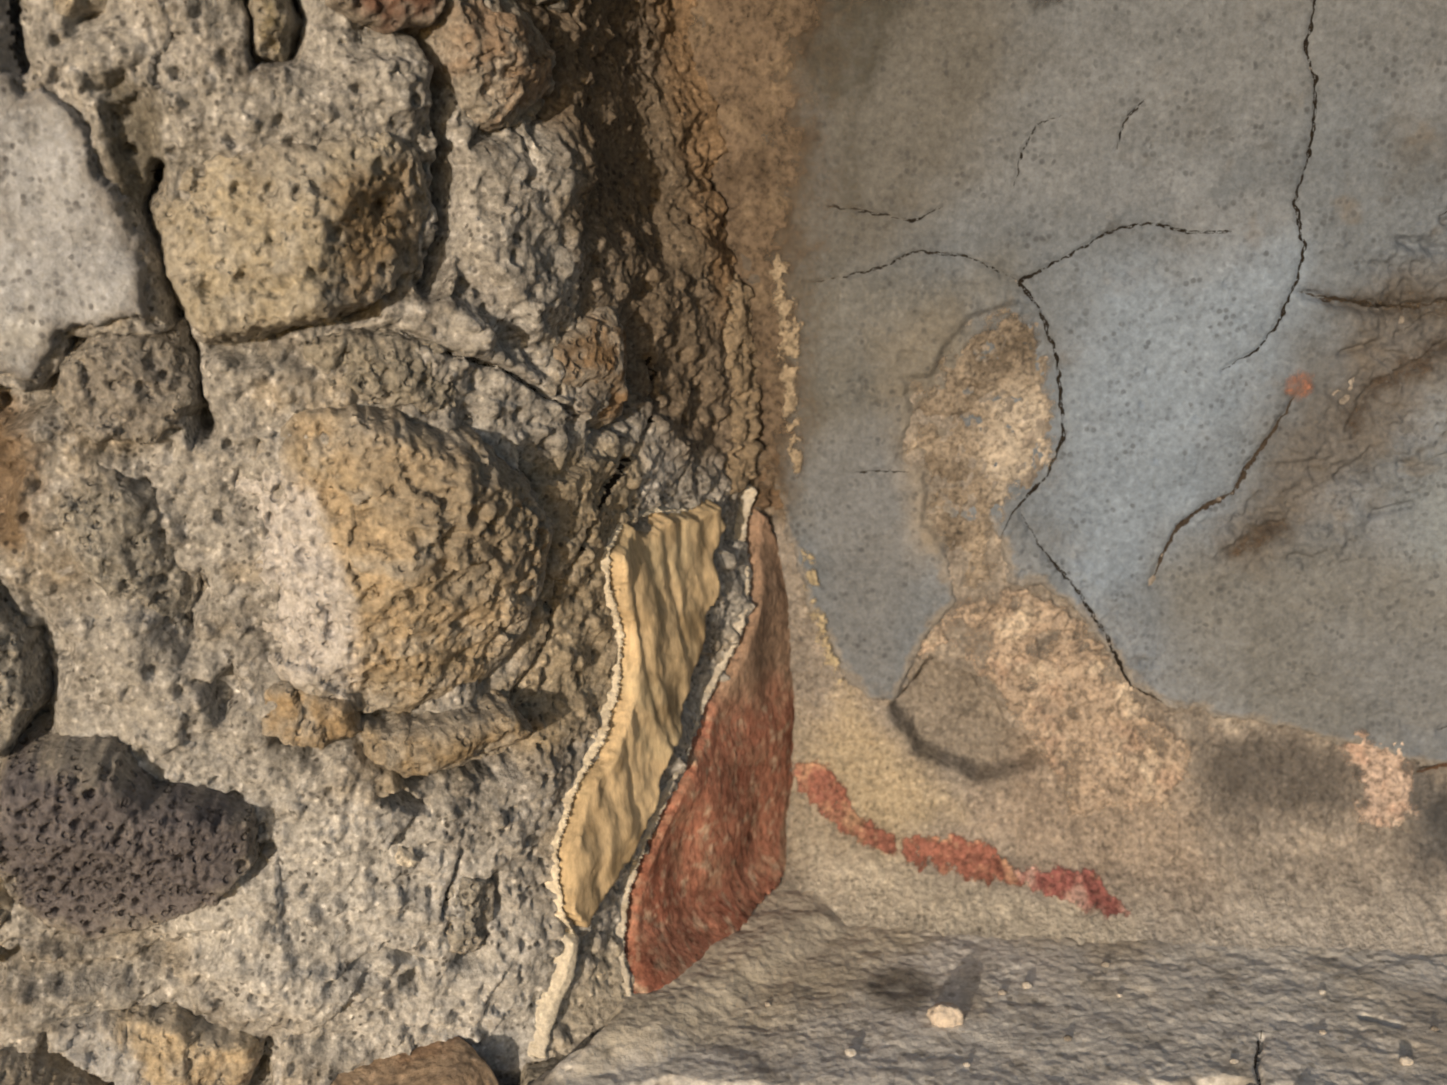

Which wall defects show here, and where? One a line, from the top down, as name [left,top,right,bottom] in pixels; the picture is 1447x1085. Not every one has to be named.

crack [1014,115,1062,185]
crack [1117,100,1145,148]
crack [1221,0,1447,371]
flaking render [541,273,1131,997]
crack [809,204,1232,702]
flaking render [905,308,1191,816]
crack [1153,396,1295,577]
flaking render [1339,732,1418,828]
crack [1417,726,1447,772]